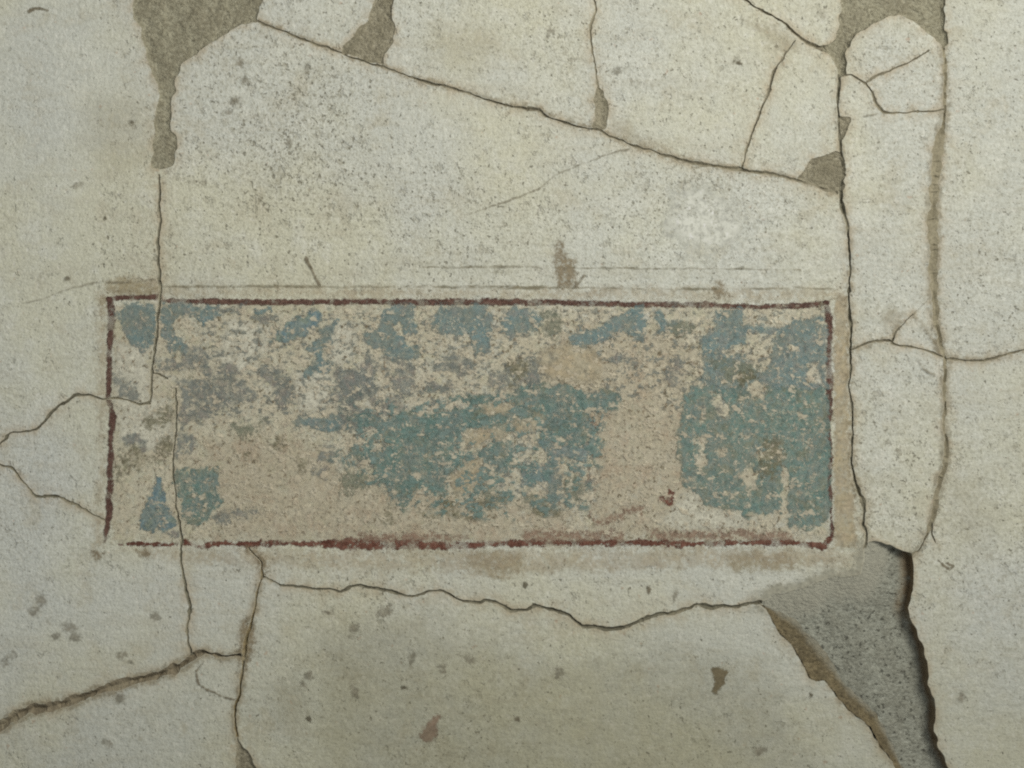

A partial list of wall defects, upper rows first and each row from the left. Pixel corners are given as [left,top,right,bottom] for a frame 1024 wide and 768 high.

crack [0,174,762,737]
crack [256,0,1024,556]
spalling [754,541,948,768]